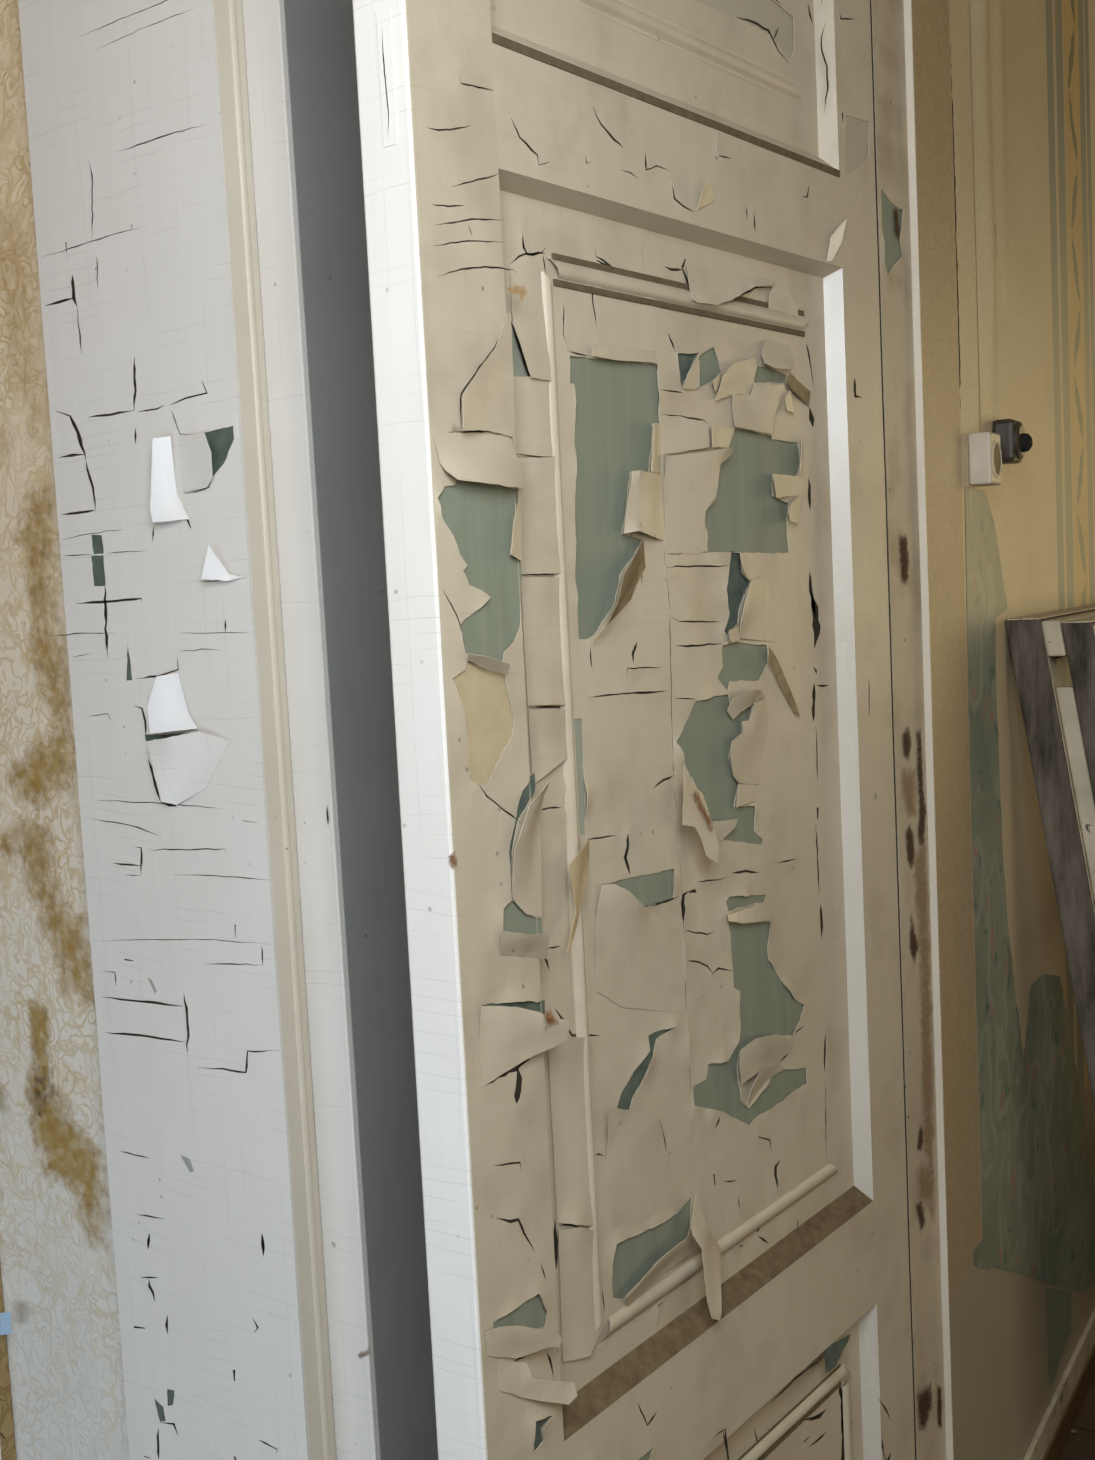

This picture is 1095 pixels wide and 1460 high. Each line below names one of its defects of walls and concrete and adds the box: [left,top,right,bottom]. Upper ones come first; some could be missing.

crack [432,173,545,276]
crack [57,357,211,556]
peeling [150,433,213,522]
leakage [14,502,66,802]
crack [87,620,262,880]
peeling [147,673,231,805]
peeling [432,255,811,959]
leakage [1,826,88,997]
leakage [25,1005,99,1232]
crack [105,925,274,1073]
peeling [478,1006,722,1405]
peeling [693,895,806,1125]